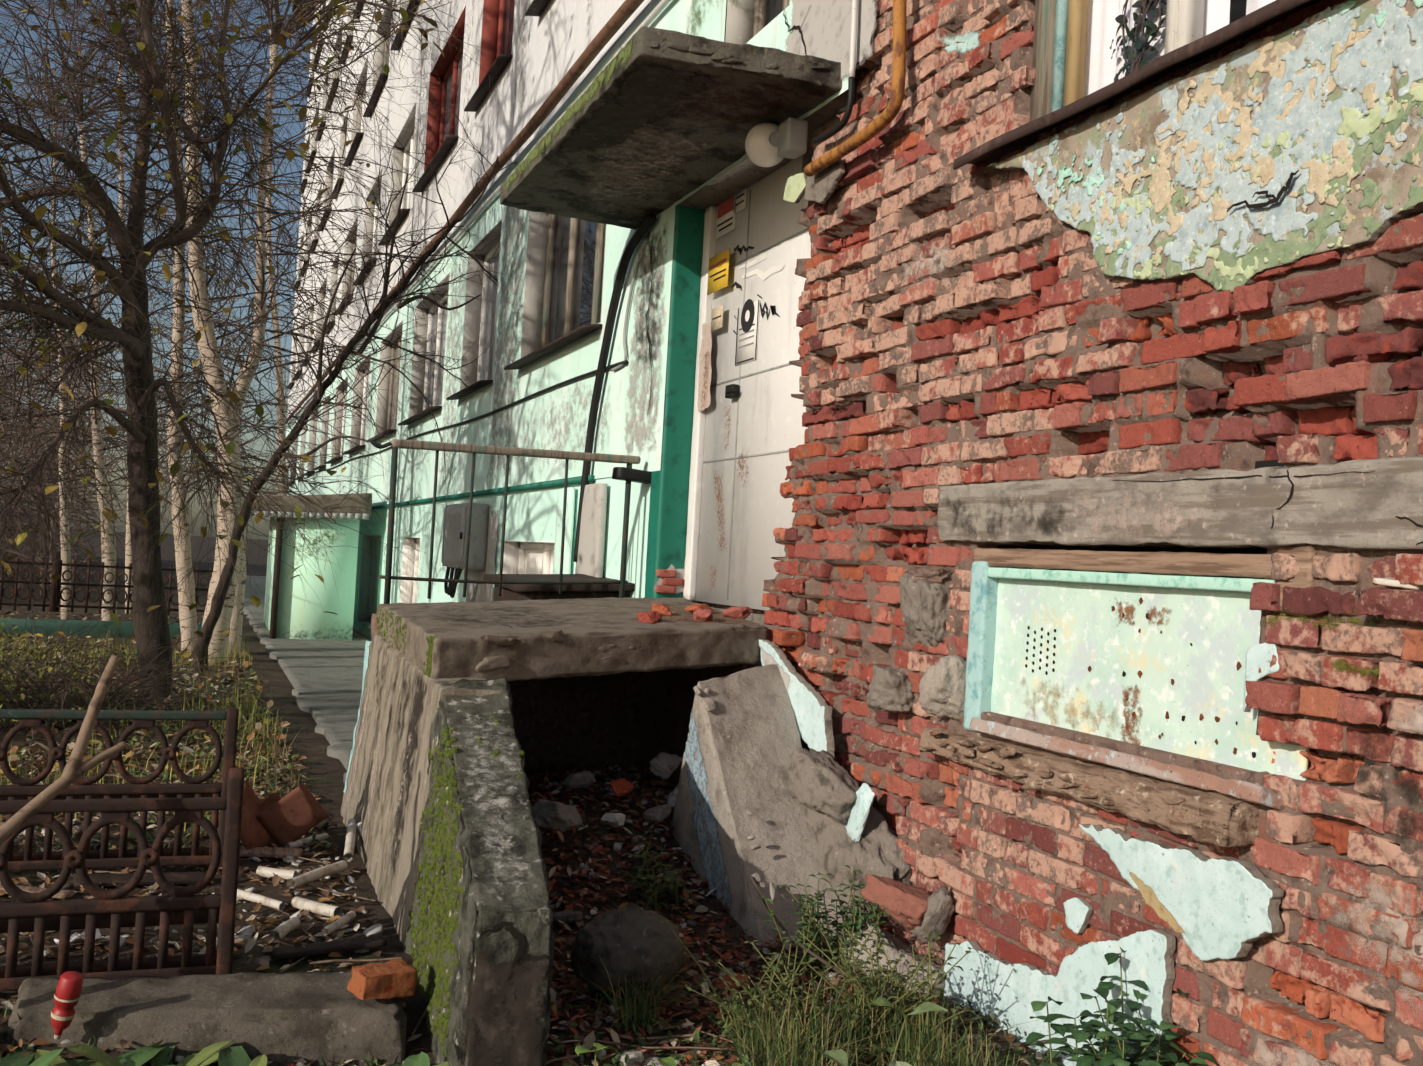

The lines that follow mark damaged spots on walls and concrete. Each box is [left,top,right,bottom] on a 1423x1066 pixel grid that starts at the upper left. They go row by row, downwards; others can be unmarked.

peeling [987,0,1423,292]
crack [1227,170,1299,212]
crack [1112,468,1373,528]
crack [1395,516,1423,545]
rust [1111,597,1169,634]
spalling [693,686,716,711]
rust [1122,670,1142,745]
rust [1158,711,1238,739]
spalling [751,873,776,903]
spalling [861,874,930,934]